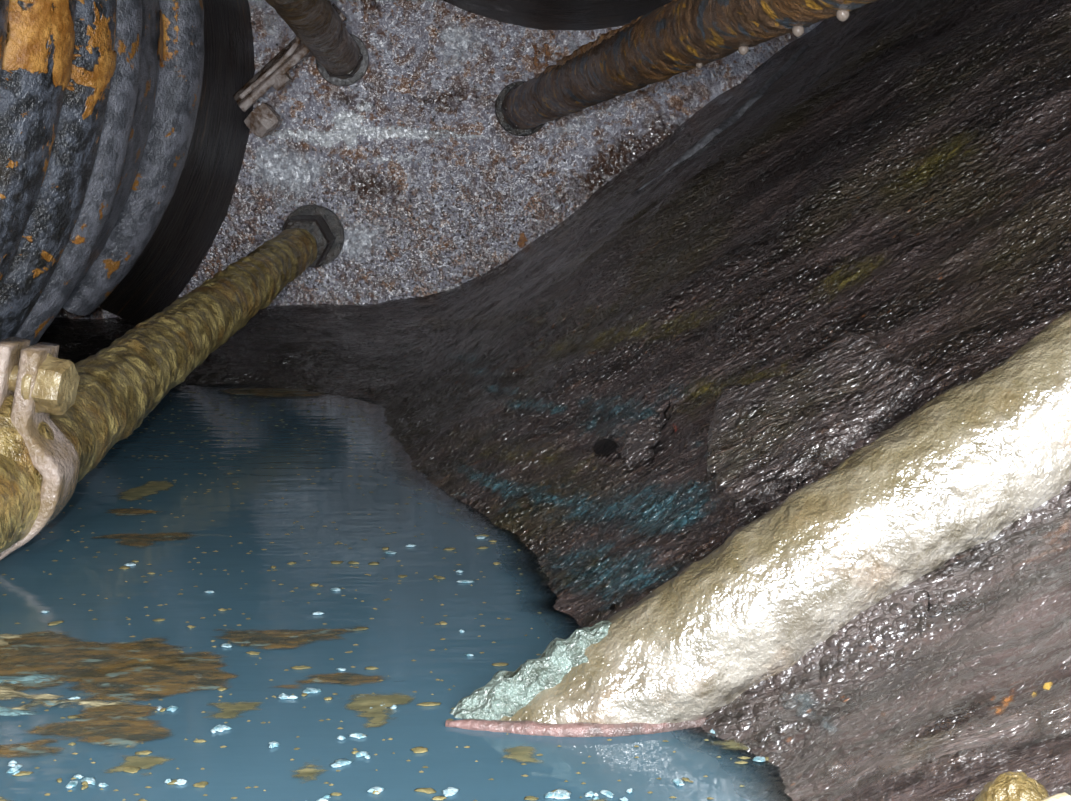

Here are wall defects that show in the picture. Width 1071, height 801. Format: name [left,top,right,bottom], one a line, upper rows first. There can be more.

rust [533,15,643,79]
rust [573,114,679,195]